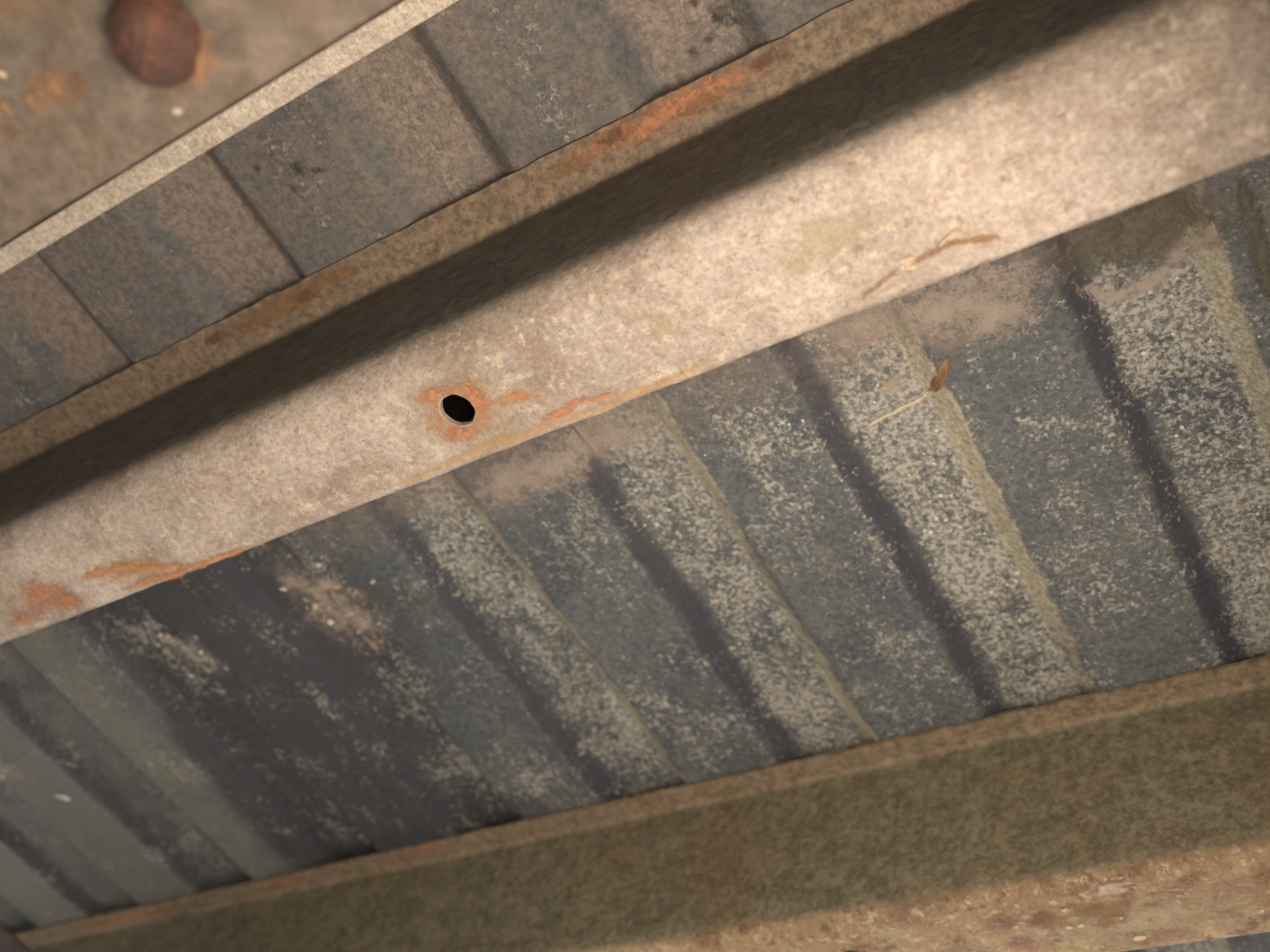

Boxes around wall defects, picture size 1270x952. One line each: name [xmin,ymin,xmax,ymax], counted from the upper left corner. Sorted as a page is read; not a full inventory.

corrosion [559,50,789,174]
corrosion [408,377,536,445]
corrosion [537,392,617,420]
corrosion [83,548,246,590]
corrosion [10,580,81,626]